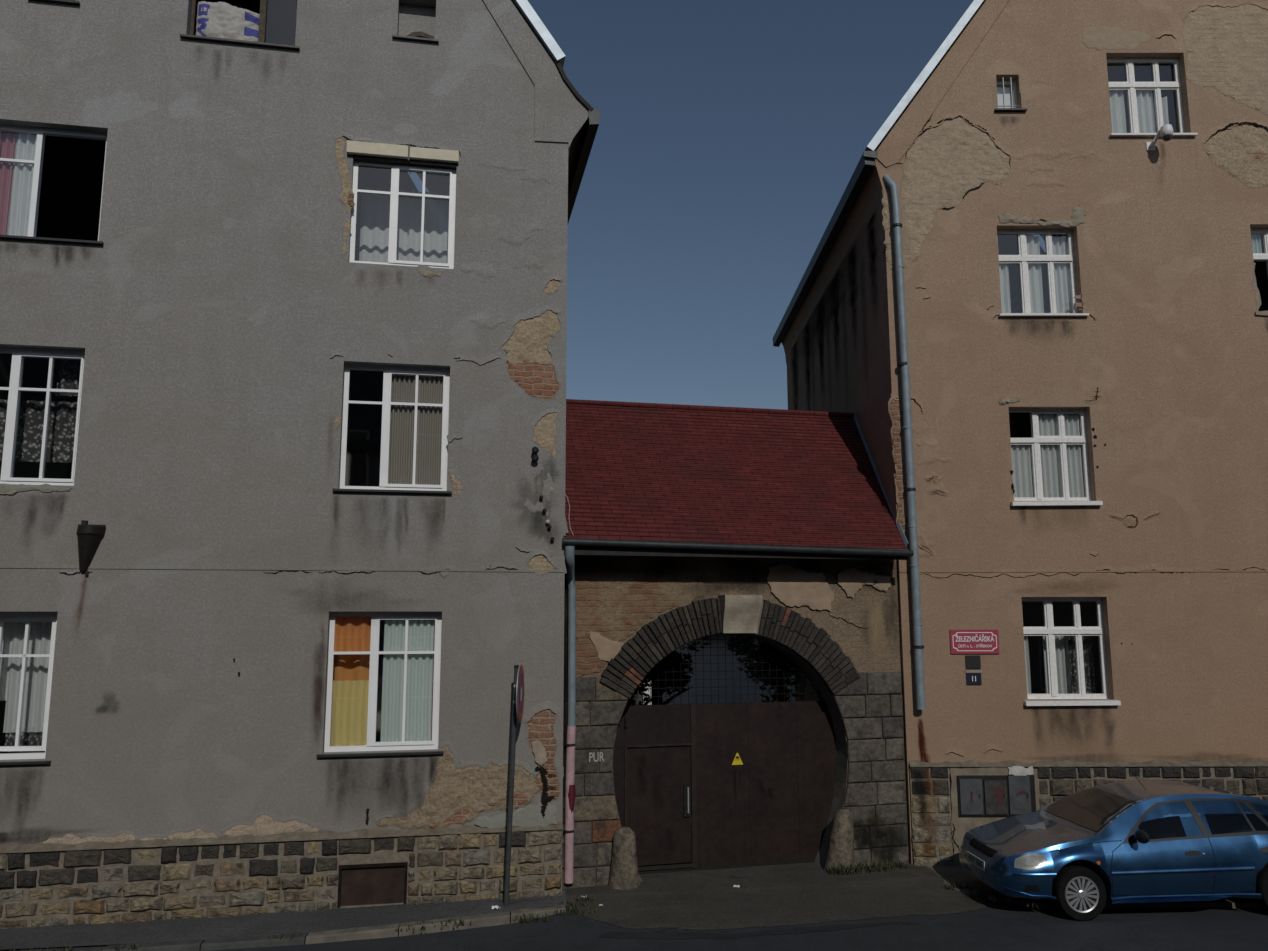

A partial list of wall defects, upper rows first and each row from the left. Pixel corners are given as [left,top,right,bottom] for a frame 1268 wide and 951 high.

peeling [1181,0,1268,189]
flaking render [333,137,354,257]
peeling [882,112,1013,270]
peeling [498,275,564,459]
peeling [0,483,72,495]
crack [59,568,93,576]
crack [264,565,376,575]
crack [414,544,560,575]
peeling [767,564,892,611]
crack [919,544,1265,578]
peeling [373,701,564,829]
corrosion [919,720,930,786]